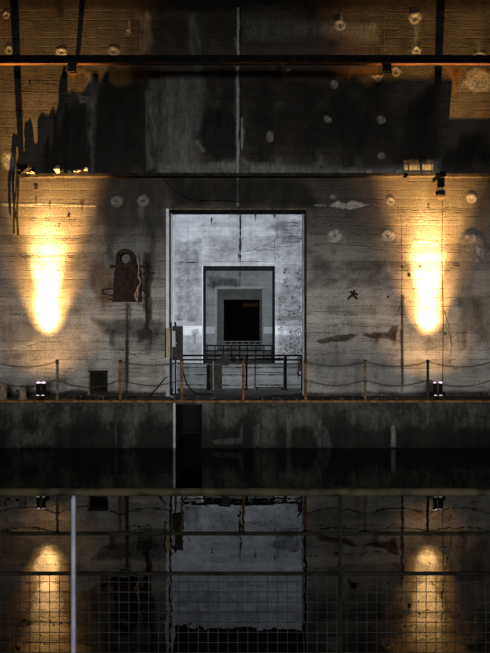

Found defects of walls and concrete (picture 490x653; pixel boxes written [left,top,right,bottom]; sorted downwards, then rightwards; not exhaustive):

leakage [45,66,438,173]
leakage [318,334,356,344]
leakage [364,326,398,340]
leakage [0,414,172,448]
leakage [202,412,490,448]